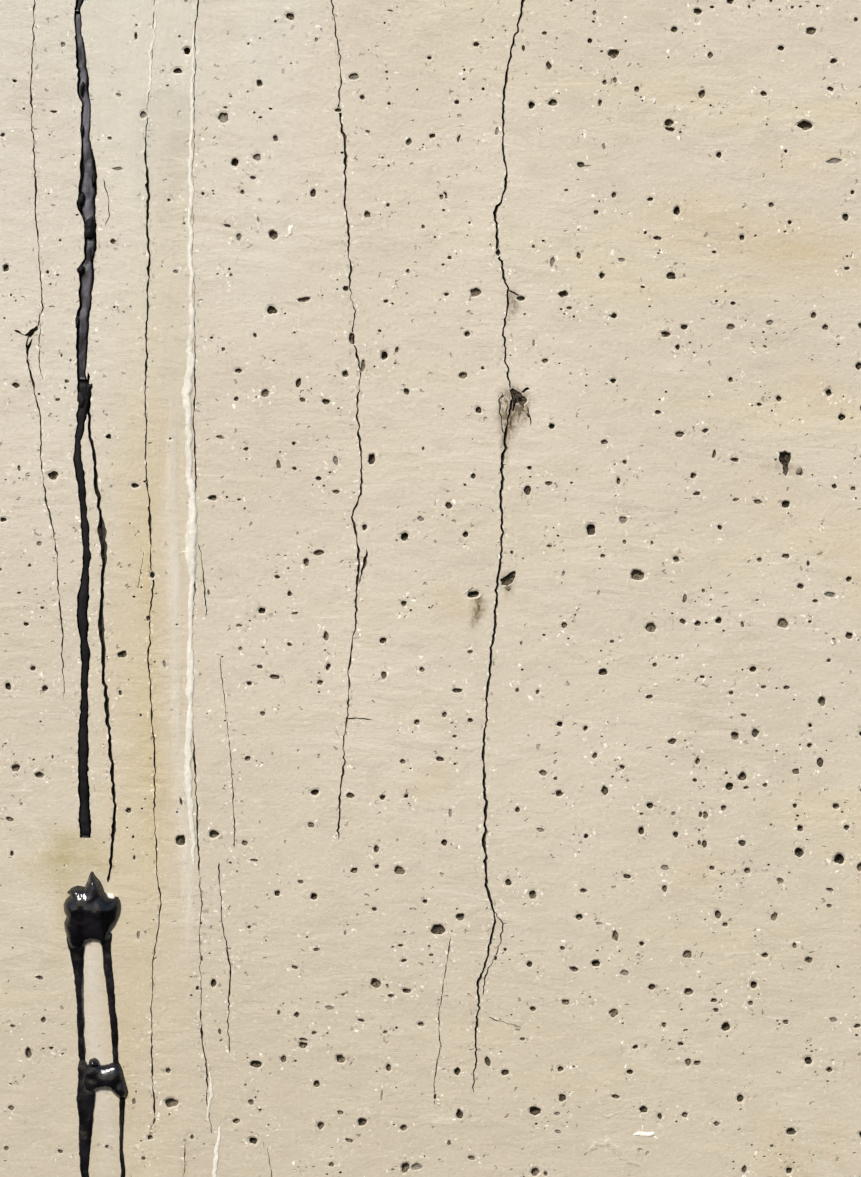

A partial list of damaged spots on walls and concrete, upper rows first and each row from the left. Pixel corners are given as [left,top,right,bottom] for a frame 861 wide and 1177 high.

crack [14,0,117,882]
crack [138,0,162,1115]
efflorescence [182,30,197,866]
crack [191,0,199,505]
crack [192,534,207,636]
crack [183,658,236,1175]
water stain [206,1072,220,1177]
crack [331,0,371,839]
crack [434,937,451,1104]
crack [472,0,532,1092]